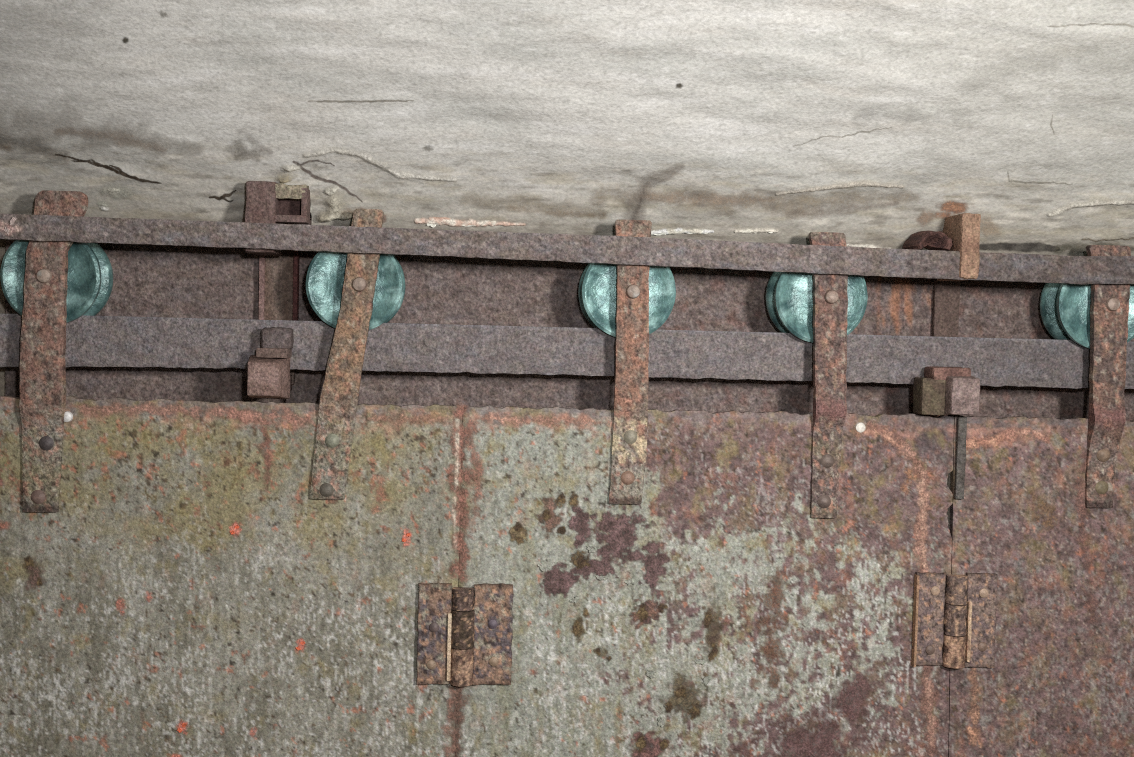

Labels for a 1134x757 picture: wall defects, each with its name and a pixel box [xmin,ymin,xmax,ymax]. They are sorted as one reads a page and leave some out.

crack [56,154,160,184]
crack [293,160,363,202]
rust [76,402,313,484]
rust [966,428,1049,449]
rust [449,405,612,582]
rust [855,421,931,573]
rust [758,571,785,688]
rust [921,665,942,757]
rust [968,668,981,745]